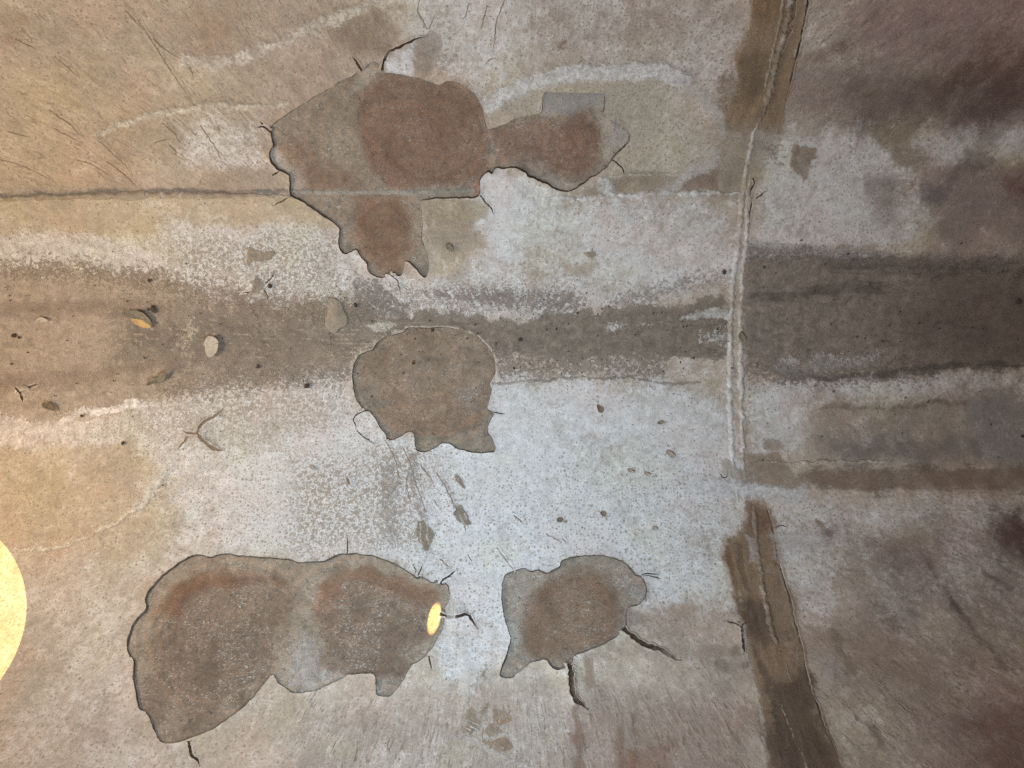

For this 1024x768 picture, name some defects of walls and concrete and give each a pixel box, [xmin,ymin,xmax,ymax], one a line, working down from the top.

crack [767,0,812,112]
peeling [269,61,630,278]
crack [746,177,765,230]
leakage [747,239,889,259]
peeling [352,327,496,453]
leakage [769,349,884,382]
peeling [127,553,450,744]
peeling [499,555,647,678]
crack [725,618,756,655]
crack [763,509,840,768]